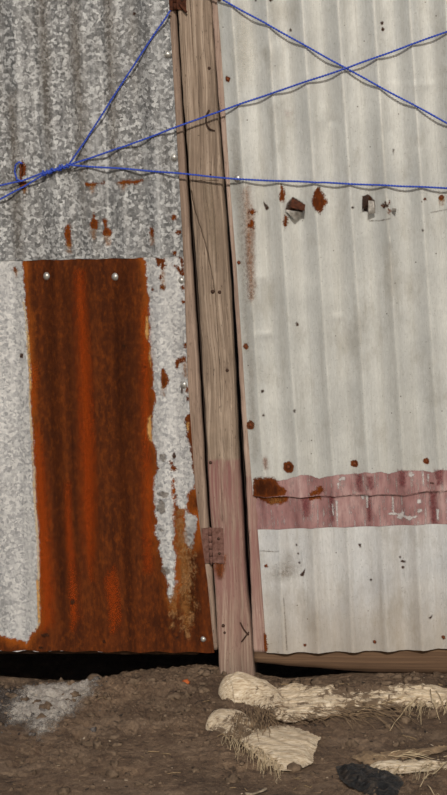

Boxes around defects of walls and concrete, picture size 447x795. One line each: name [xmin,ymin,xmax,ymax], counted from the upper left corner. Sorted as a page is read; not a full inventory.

rust [311,187,328,215]
rust [90,212,114,245]
rust [0,251,226,653]
rust [253,477,288,505]
rust [309,486,324,501]